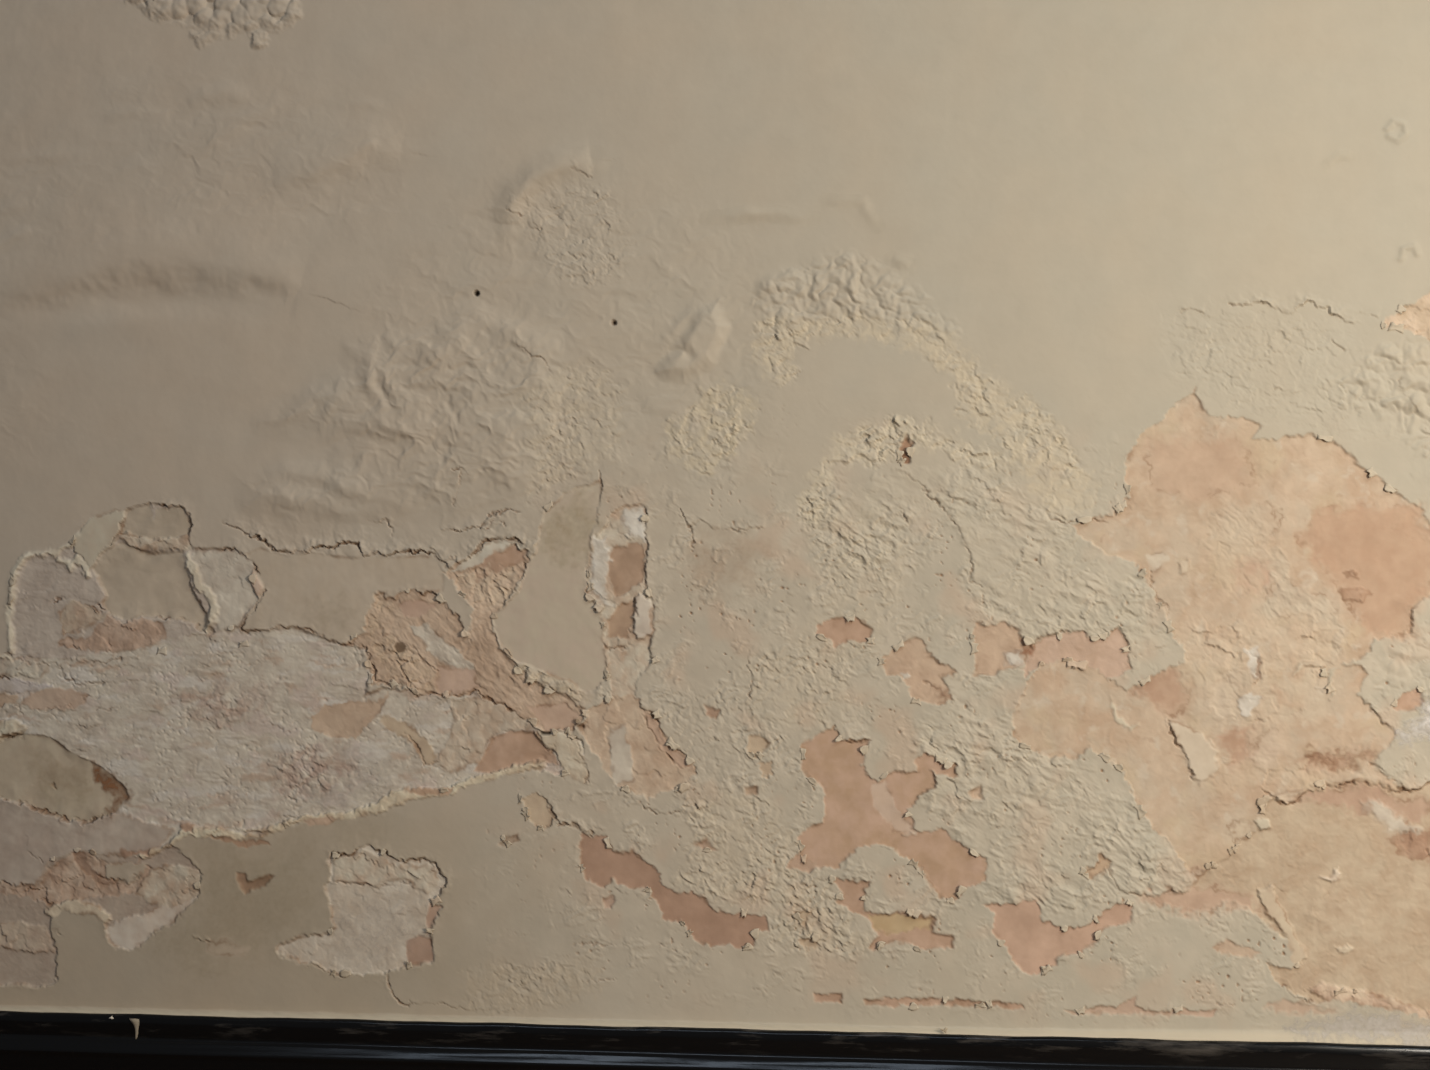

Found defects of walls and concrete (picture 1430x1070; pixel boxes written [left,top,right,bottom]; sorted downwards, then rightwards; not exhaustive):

flaking render [0,502,698,989]
peeling [518,295,1430,1020]